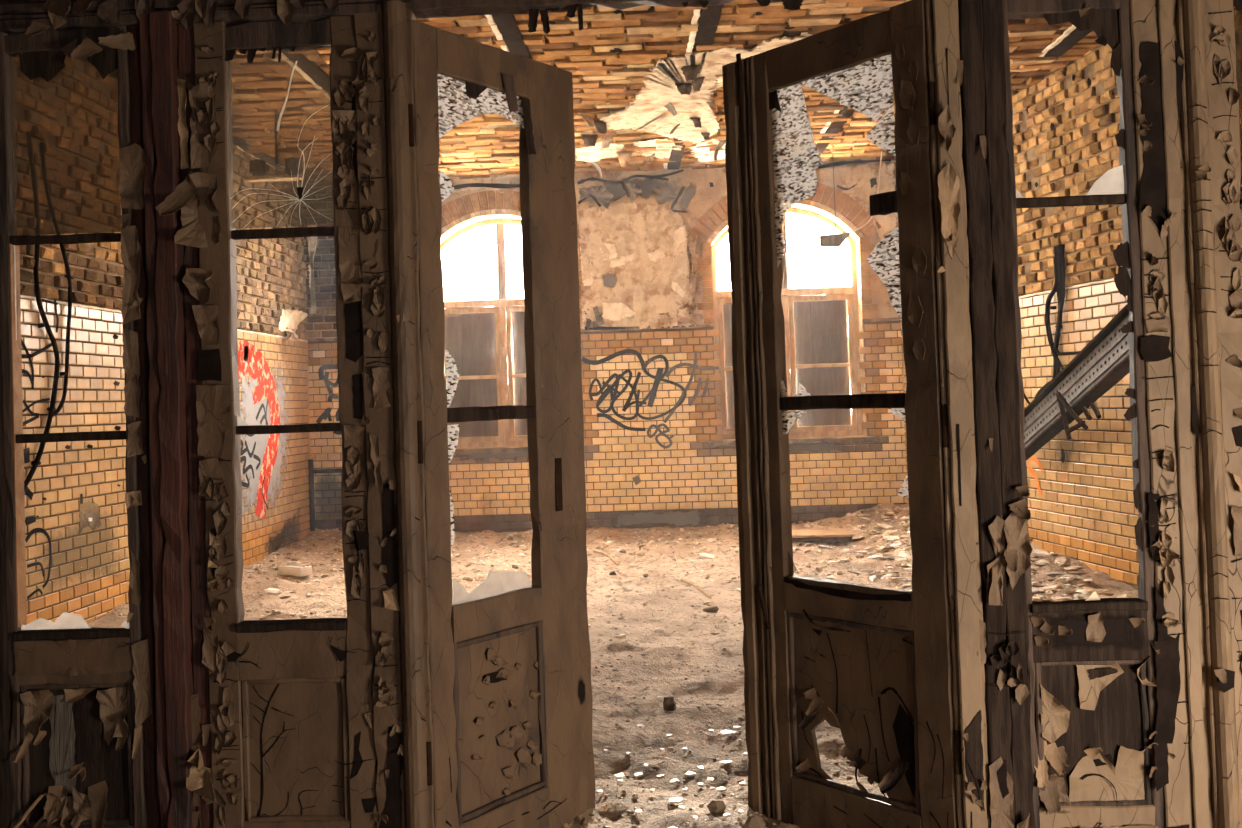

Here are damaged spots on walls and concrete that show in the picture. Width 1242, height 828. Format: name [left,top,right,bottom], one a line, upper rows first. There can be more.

peeling [113,46,296,464]
peeling [575,25,813,330]
peeling [755,0,803,16]
peeling [1043,7,1121,77]
peeling [1115,41,1185,232]
peeling [986,485,1033,606]
peeling [1133,458,1161,560]
peeling [13,638,152,828]
crack [249,684,343,816]
crack [798,633,949,828]
peeling [962,710,1032,828]
peeling [979,588,1181,815]